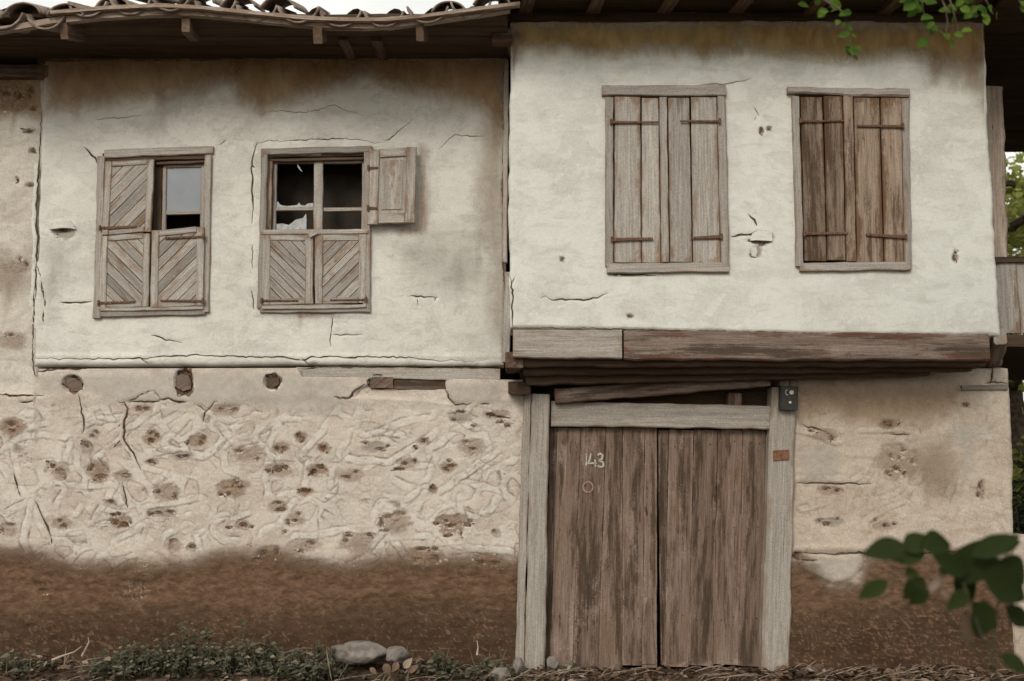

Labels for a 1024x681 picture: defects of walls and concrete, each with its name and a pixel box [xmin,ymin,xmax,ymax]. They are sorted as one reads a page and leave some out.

water stain [512,21,985,63]
crack [0,104,511,431]
crack [438,117,813,339]
spalling [747,231,772,258]
crack [14,475,52,543]
crack [113,390,216,508]
crack [797,479,870,487]